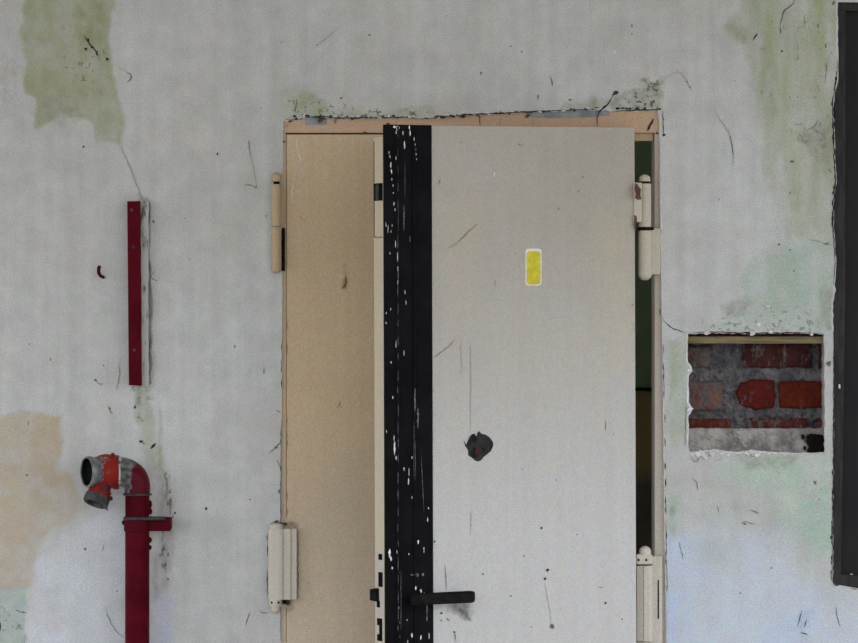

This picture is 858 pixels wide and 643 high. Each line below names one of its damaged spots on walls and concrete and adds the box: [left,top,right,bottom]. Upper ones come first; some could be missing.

crack [596,91,619,127]
water stain [16,0,172,515]
spalling [687,323,813,341]
spalling [685,355,798,462]